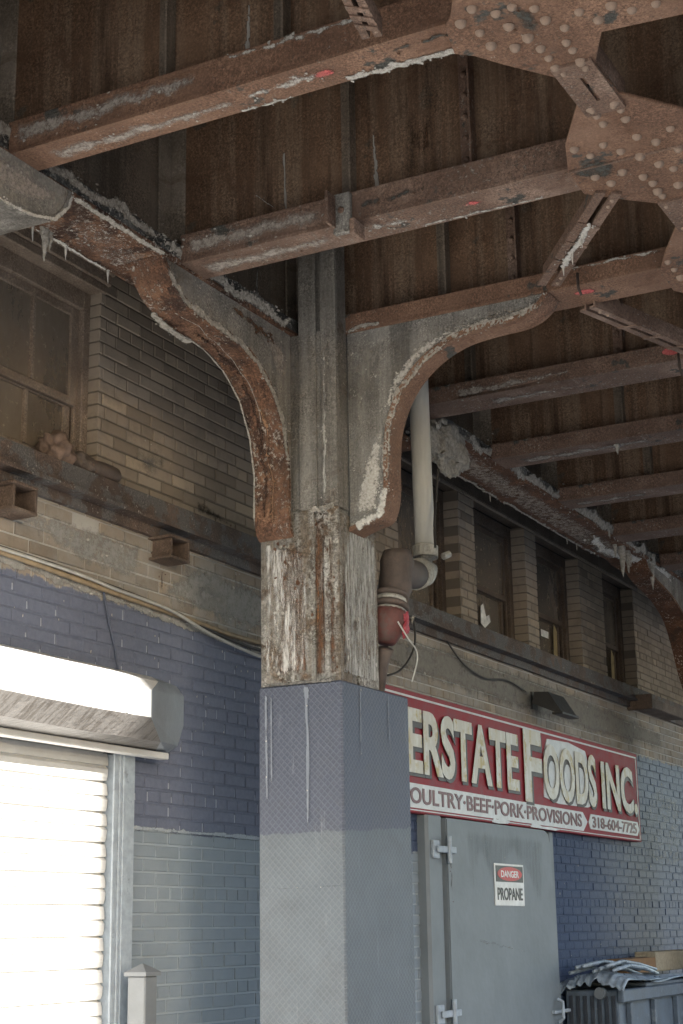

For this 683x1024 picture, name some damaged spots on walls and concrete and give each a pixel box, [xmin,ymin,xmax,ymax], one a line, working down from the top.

water stain [0,159,292,524]
efflorescence [458,440,679,581]
rust [273,519,349,675]